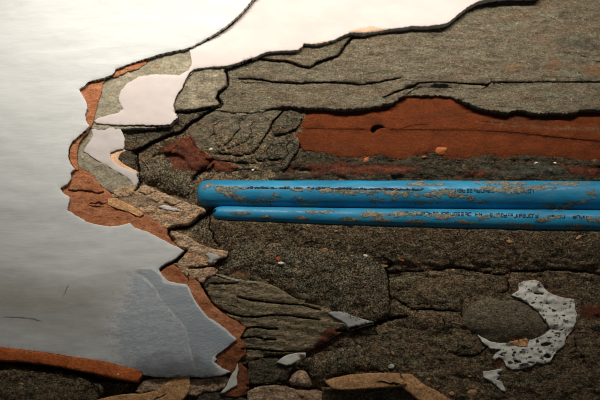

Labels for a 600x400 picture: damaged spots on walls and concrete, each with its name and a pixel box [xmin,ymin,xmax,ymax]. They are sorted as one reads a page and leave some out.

peeling [188,109,302,174]
crack [121,36,597,191]
spalling [61,49,266,397]
crack [219,298,318,352]
peeling [277,353,306,366]
peeling [329,311,374,330]
peeling [478,280,577,392]